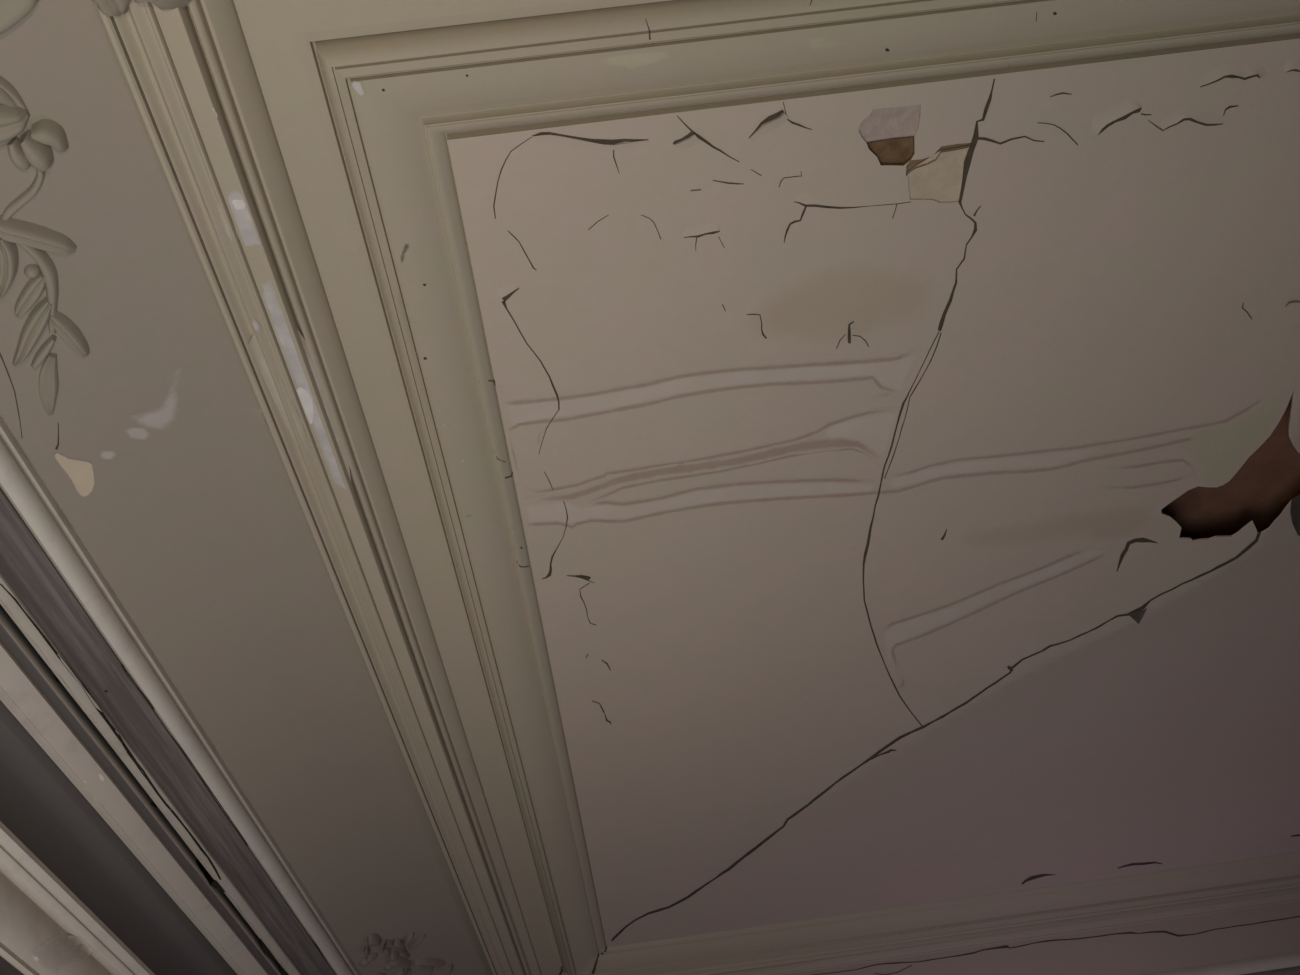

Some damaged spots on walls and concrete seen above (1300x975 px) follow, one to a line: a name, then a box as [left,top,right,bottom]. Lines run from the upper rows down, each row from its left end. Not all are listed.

peeling [859,105,970,203]
peeling [54,453,95,497]
crack [493,102,911,670]
crack [559,60,1300,975]
crack [0,584,225,892]
crack [121,665,248,846]
crack [260,938,289,975]